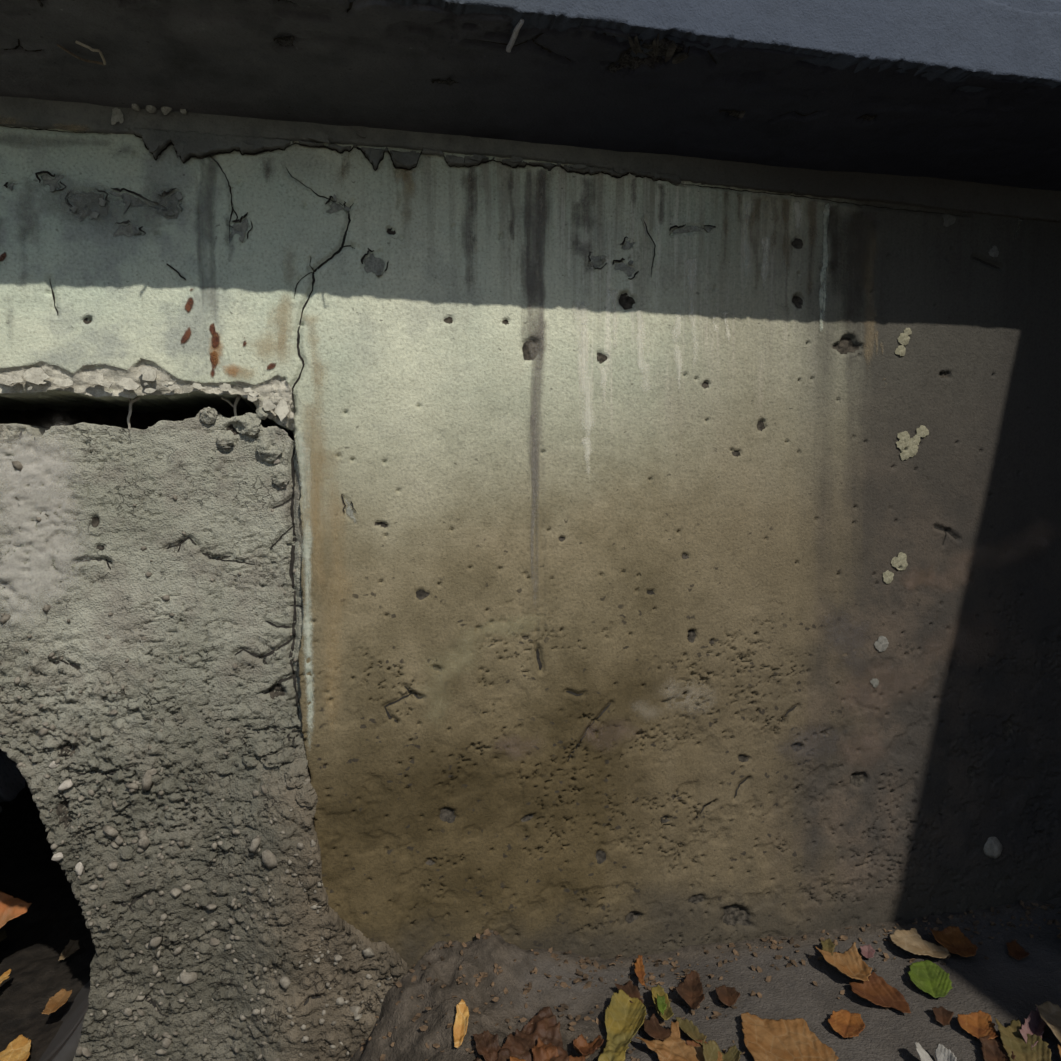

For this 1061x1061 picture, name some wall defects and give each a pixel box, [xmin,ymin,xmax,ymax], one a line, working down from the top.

peeling [124,126,681,186]
spalling [35,171,183,237]
crack [285,166,355,414]
damp [784,201,875,328]
spalling [0,358,295,430]
corrosion [209,323,237,377]
damp [510,170,547,557]
crack [76,558,112,570]
crack [167,446,304,743]
crack [53,660,79,669]